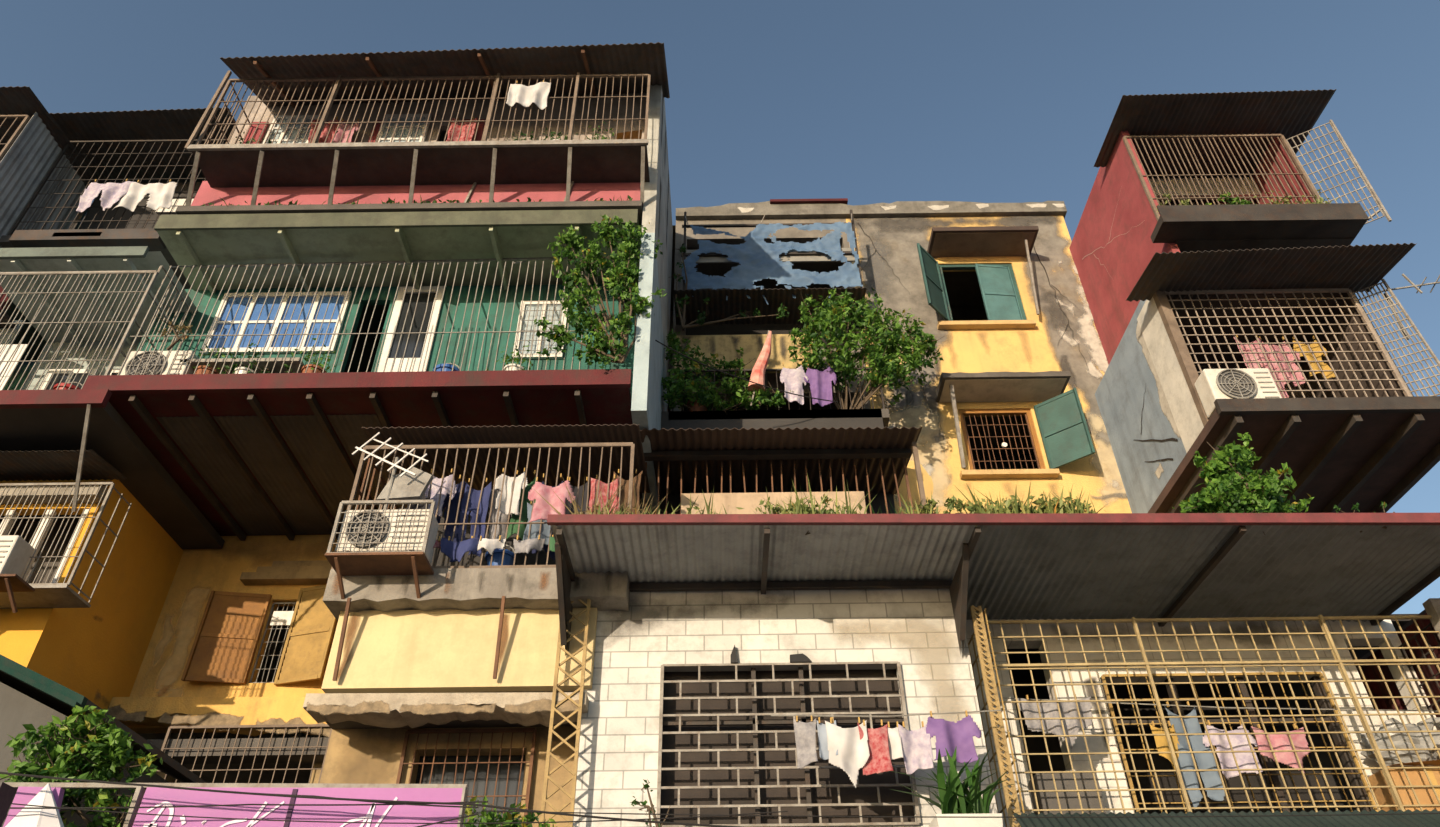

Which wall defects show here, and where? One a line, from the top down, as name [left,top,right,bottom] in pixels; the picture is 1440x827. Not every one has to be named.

peeling [1058,261,1109,379]
peeling [1086,414,1127,502]
spalling [107,589,583,737]
water stain [615,600,690,633]